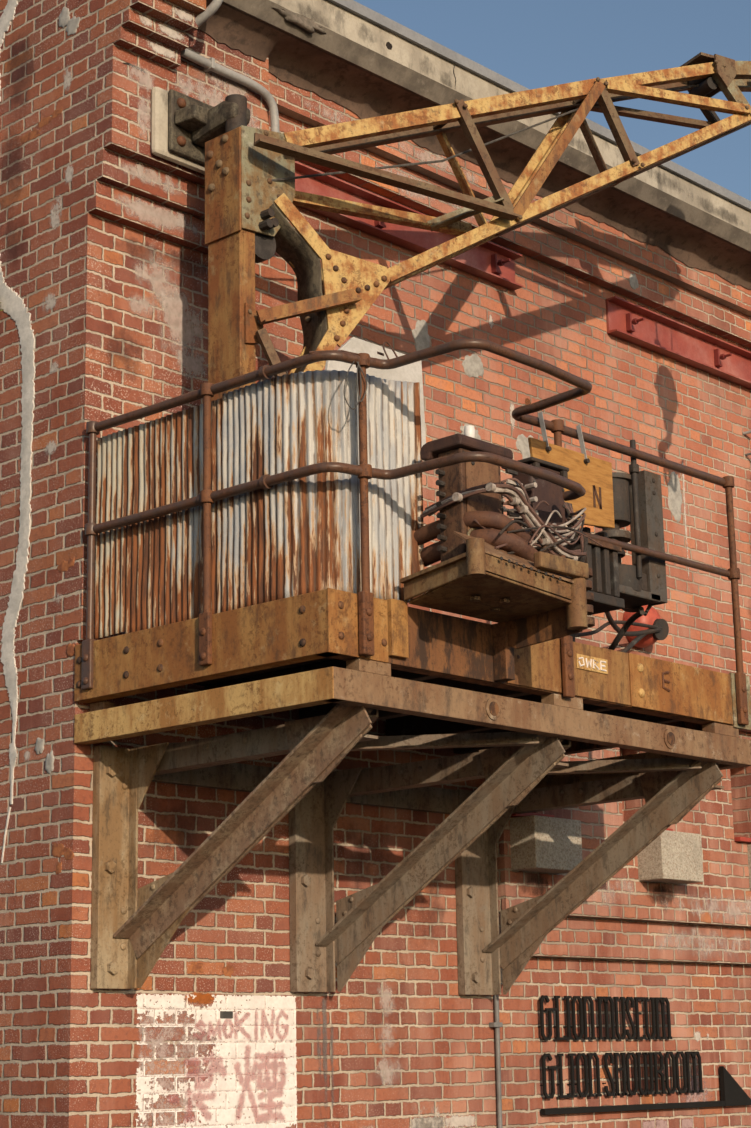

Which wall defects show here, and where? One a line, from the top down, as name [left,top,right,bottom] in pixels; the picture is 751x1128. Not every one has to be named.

crack [0,0,18,102]
crack [0,254,36,863]
peeling [136,1016,178,1061]